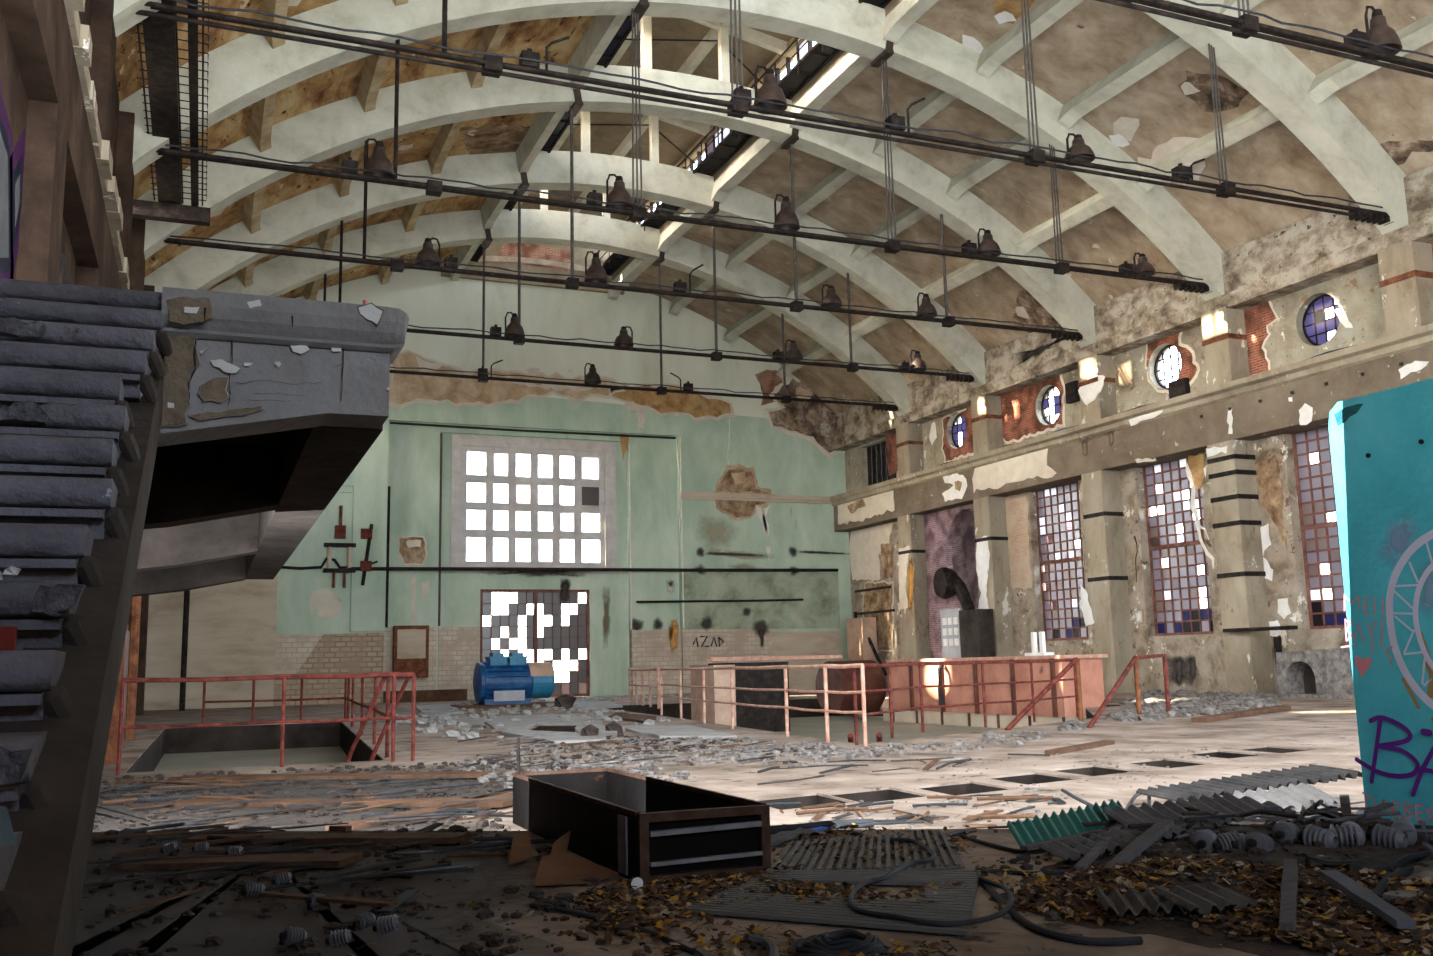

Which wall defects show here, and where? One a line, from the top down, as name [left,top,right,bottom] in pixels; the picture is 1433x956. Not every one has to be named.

flaking render [287,0,339,17]
peeling [159,296,264,428]
peeling [386,349,735,458]
spalling [755,369,845,459]
spalling [1129,410,1163,426]
flaking render [1145,332,1200,394]
flaking render [1244,301,1279,375]
spalling [715,464,771,560]
flaking render [929,373,1105,590]
peeling [976,536,990,609]